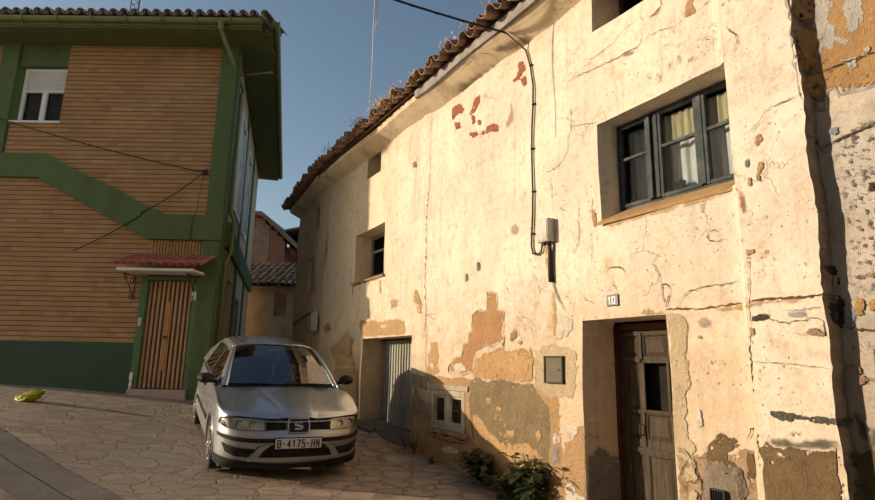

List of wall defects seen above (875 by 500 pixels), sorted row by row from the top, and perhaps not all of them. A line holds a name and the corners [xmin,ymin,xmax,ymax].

flaking render [451,95,513,138]
flaking render [513,61,527,85]
crack [573,4,682,79]
crack [746,92,817,135]
peeling [784,0,875,113]
crack [547,109,629,291]
peeling [332,318,405,419]
flaking render [410,290,621,500]
flaking render [641,309,875,500]